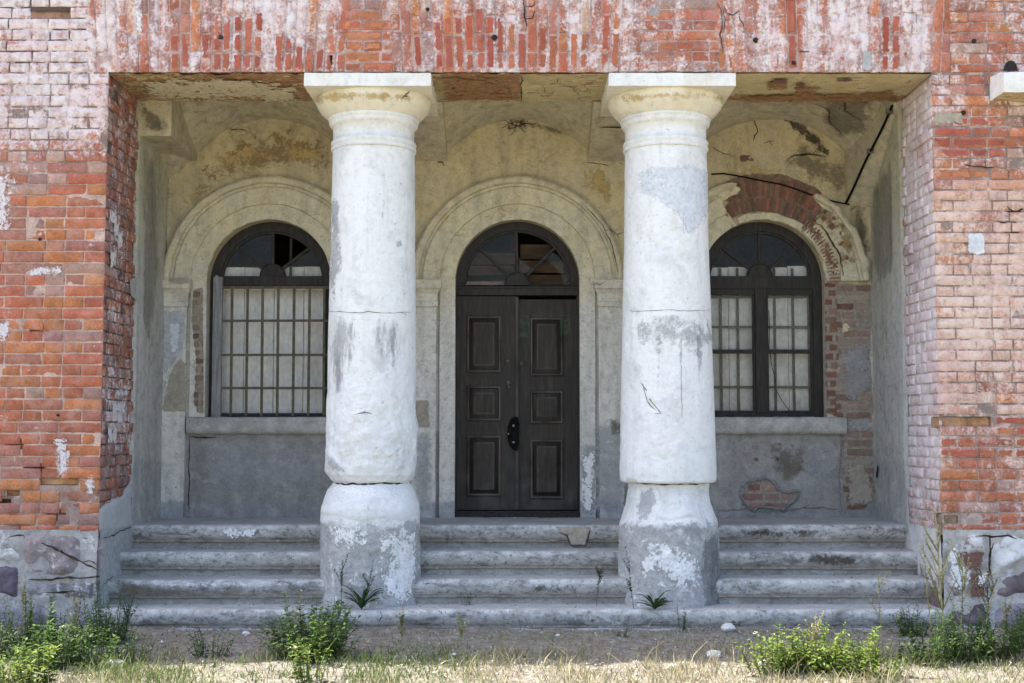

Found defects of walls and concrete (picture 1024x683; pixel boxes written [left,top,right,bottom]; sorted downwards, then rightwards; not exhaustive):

water stain [190,132,328,200]
peeling [636,164,708,233]
crack [753,121,826,159]
crack [813,102,861,134]
water stain [330,201,341,293]
spalling [724,155,875,514]
peeling [581,451,596,513]
crack [9,527,131,608]
peeling [329,524,368,550]
peeling [379,527,417,605]
peeling [642,542,700,590]
crack [979,535,1016,576]